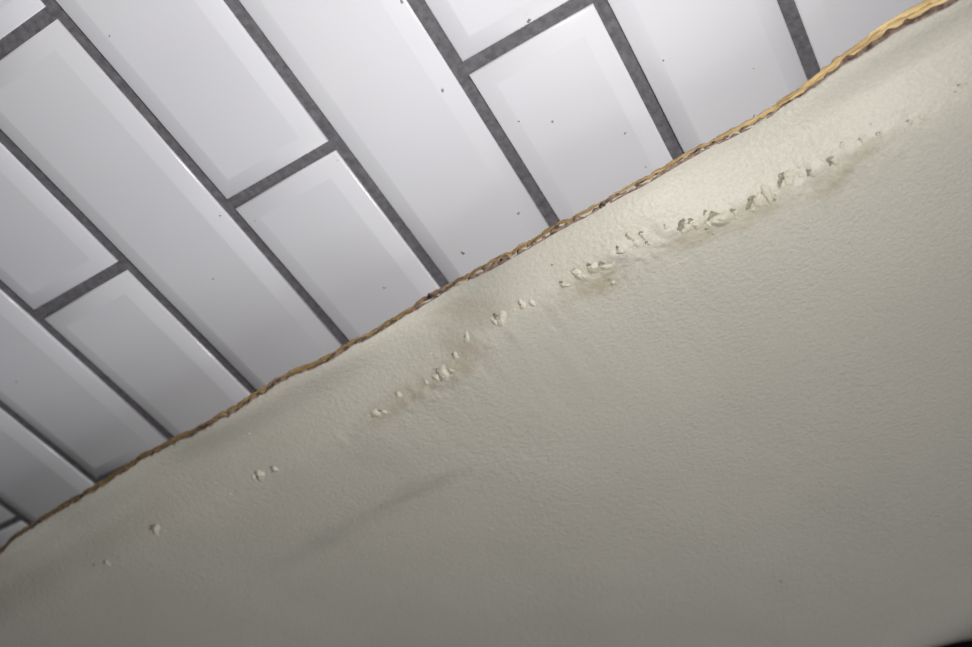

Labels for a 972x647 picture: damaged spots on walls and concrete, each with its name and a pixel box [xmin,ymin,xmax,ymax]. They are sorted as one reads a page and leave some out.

peeling [663,184,780,235]
peeling [559,231,652,288]